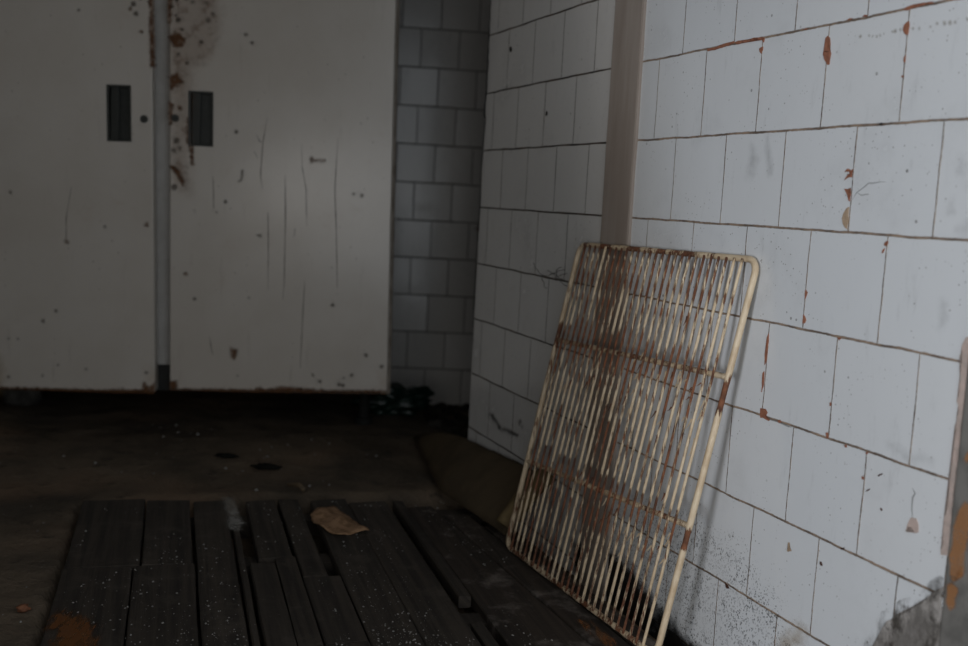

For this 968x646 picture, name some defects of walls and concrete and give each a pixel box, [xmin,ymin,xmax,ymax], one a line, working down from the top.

corrosion [141,0,157,67]
corrosion [168,0,188,64]
spalling [823,36,831,65]
spalling [842,169,853,229]
spalling [873,337,968,646]